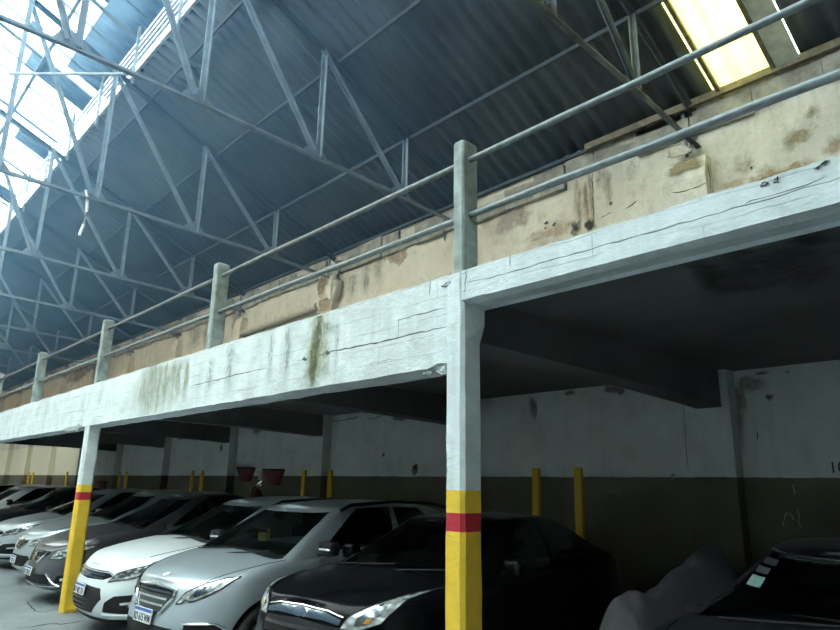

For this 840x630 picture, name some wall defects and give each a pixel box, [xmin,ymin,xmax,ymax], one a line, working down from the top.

crack [672,165,712,193]
crack [464,174,840,293]
peeling [316,274,333,315]
crack [297,281,445,363]
damp [308,323,327,381]
damp [141,364,189,403]